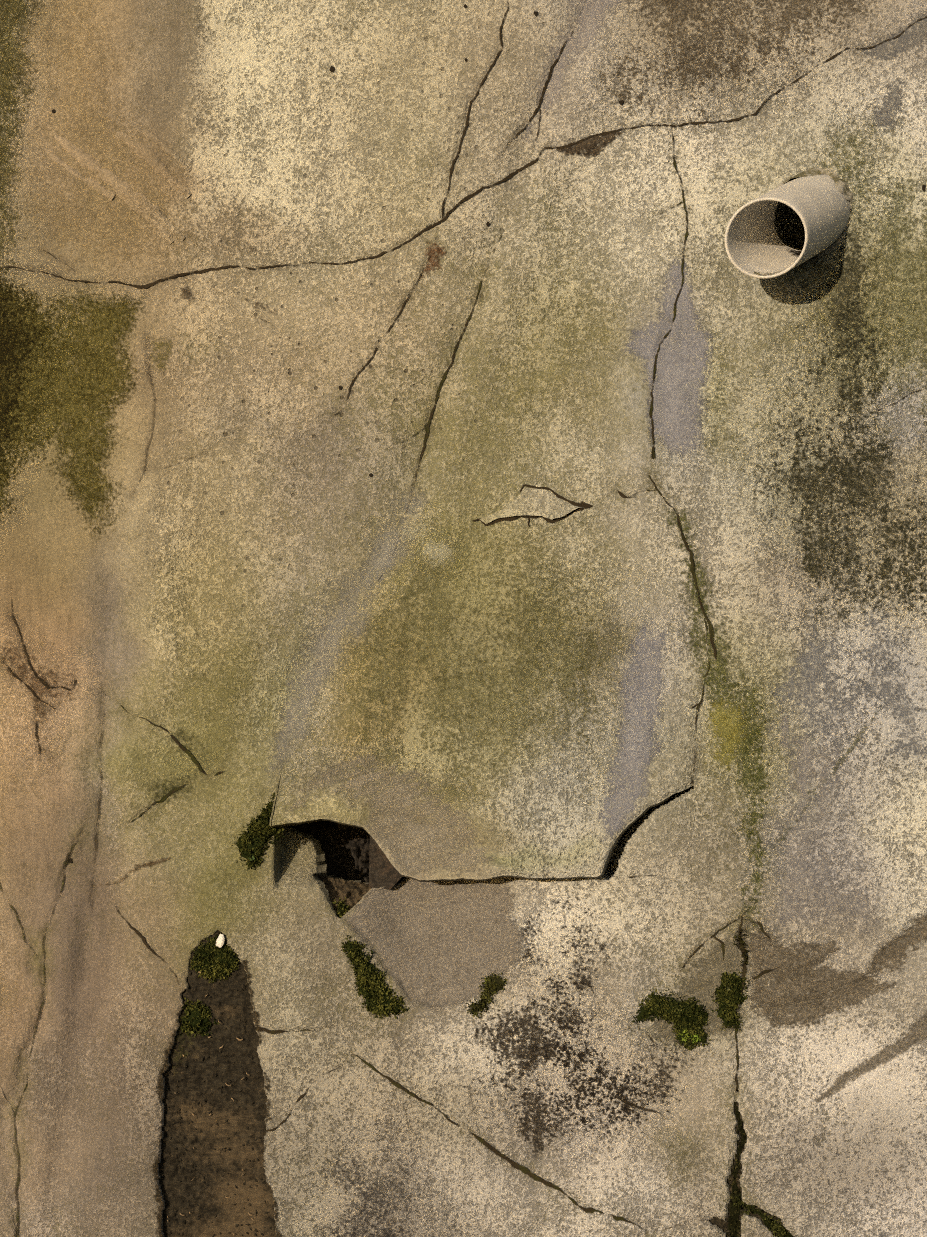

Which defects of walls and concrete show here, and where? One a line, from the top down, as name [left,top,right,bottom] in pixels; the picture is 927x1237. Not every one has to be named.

damp [540,0,867,117]
crack [0,2,927,783]
damp [754,221,927,619]
crack [0,705,223,1237]
spalling [152,930,282,1237]
spalling [290,755,526,1010]
crack [266,1054,672,1234]
crack [682,901,793,1237]